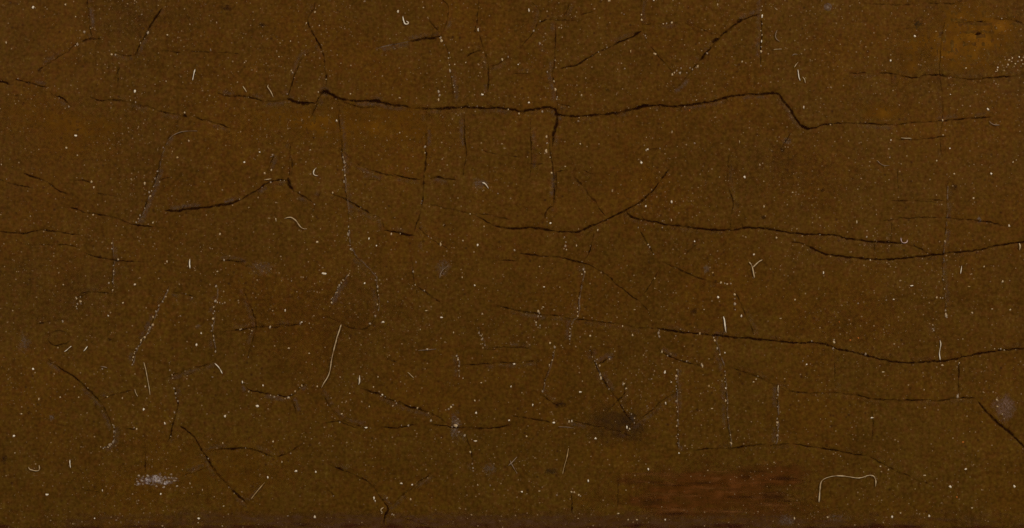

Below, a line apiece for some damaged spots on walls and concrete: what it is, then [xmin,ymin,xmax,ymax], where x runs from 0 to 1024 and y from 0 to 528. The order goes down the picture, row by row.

crack [0,10,161,107]
crack [1,147,368,400]
crack [288,6,1024,476]
crack [169,369,291,500]